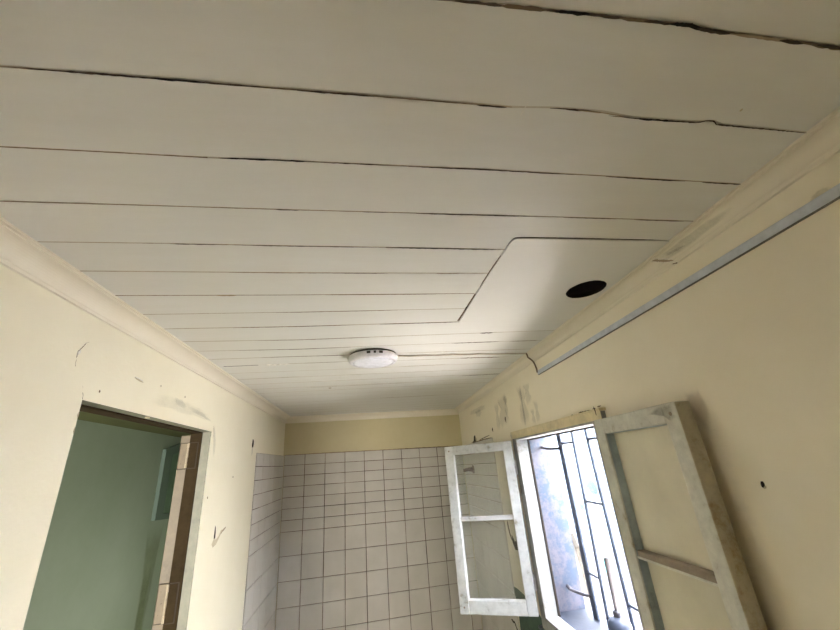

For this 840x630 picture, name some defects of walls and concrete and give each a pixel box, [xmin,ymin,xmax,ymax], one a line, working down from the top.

crack [439,0,840,50]
crack [0,66,512,108]
crack [550,108,804,133]
crack [0,146,741,185]
crack [115,273,537,398]